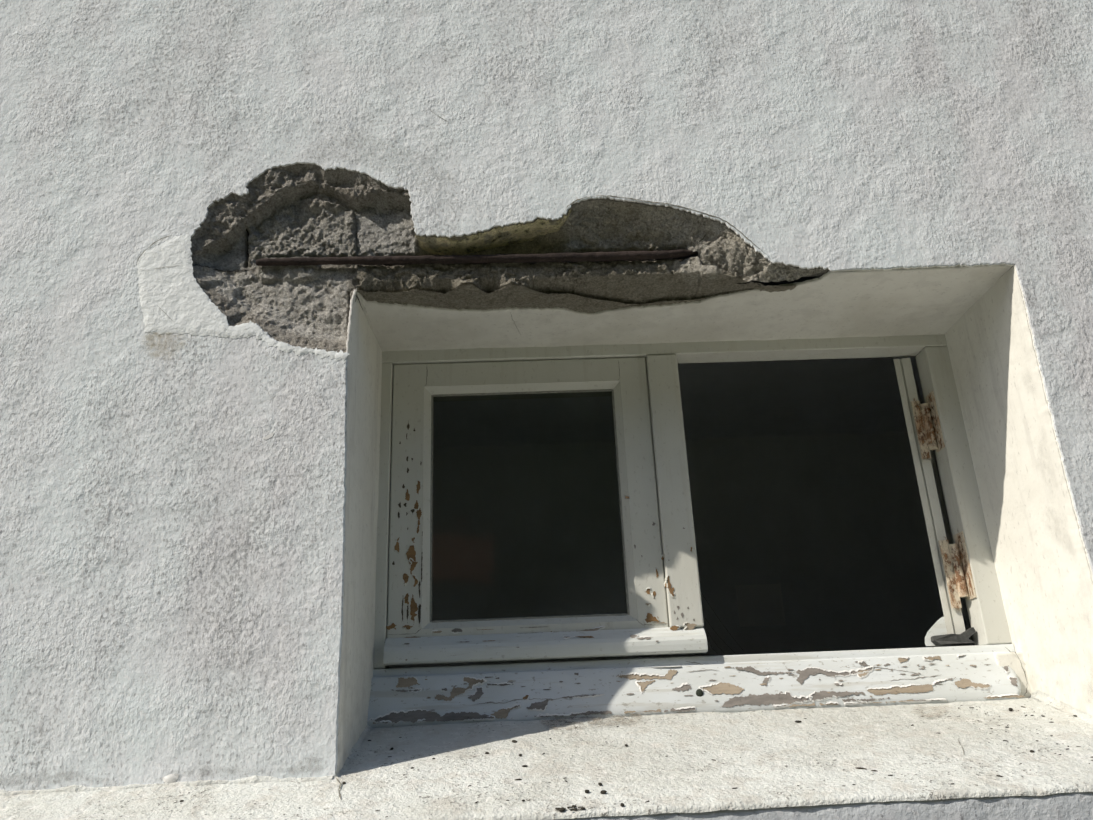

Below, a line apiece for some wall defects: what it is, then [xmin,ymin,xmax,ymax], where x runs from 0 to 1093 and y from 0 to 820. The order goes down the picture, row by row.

spalling [136,164,827,363]
peeling [386,456,423,645]
peeling [630,554,696,642]
peeling [368,655,1024,725]